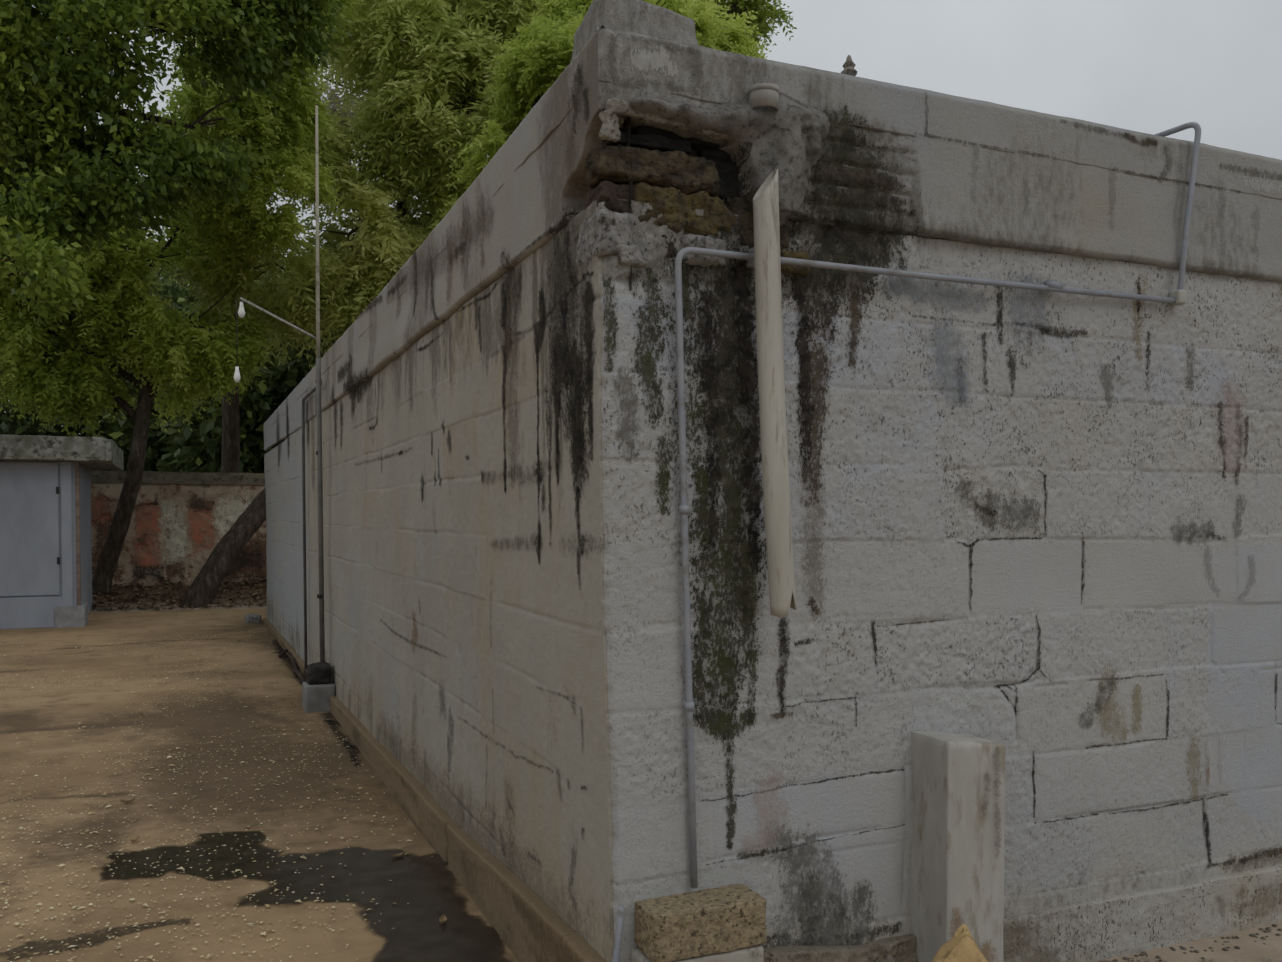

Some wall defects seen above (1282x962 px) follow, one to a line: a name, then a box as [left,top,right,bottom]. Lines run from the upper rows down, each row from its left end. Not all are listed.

spalling [576,32,755,291]
leakage [357,252,445,325]
spalling [780,220,811,276]
leakage [276,399,290,472]
leakage [305,353,362,449]
leakage [498,212,671,590]
peeling [91,493,112,579]
peeling [157,493,258,582]
flaking render [222,536,267,585]
leakage [674,228,901,948]